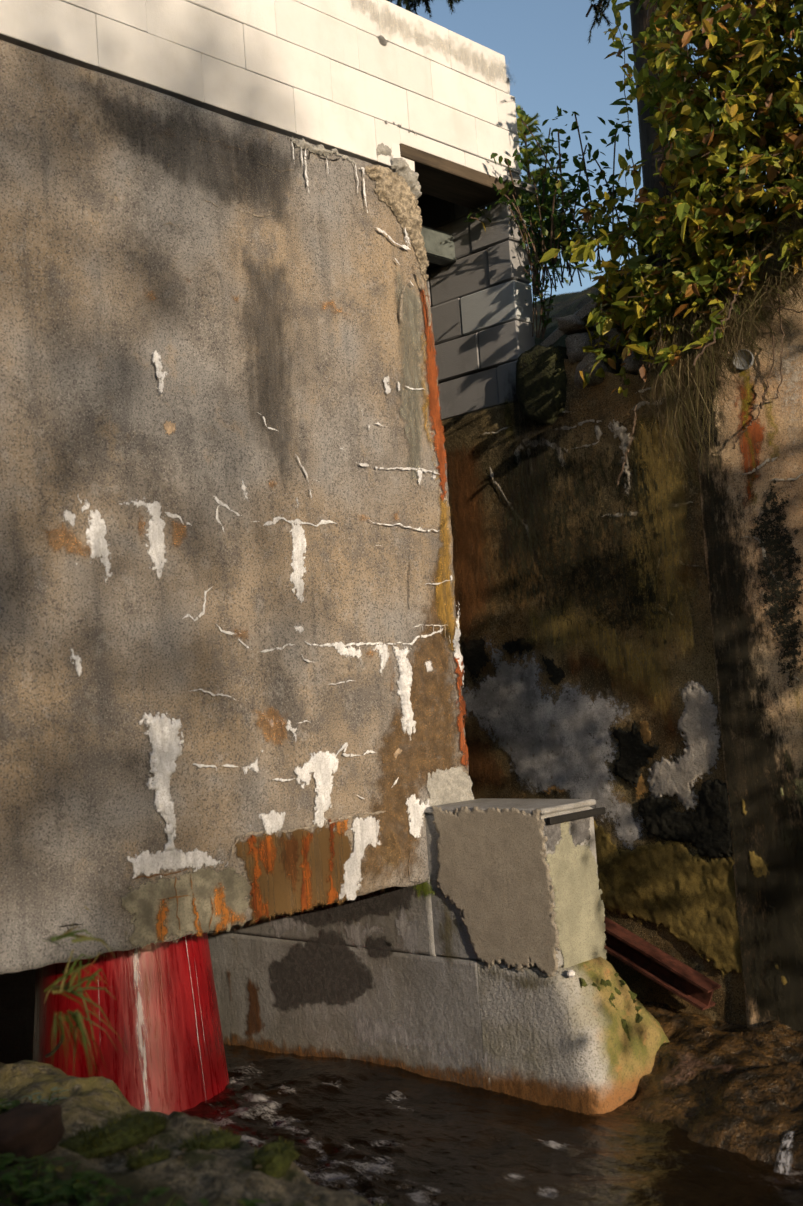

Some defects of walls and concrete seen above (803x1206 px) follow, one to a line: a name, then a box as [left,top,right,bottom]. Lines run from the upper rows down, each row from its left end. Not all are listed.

spalling [365,143,429,281]
crack [359,463,439,484]
efflorescence [608,419,635,496]
rust [736,370,765,506]
damp [503,637,566,685]
damp [259,572,492,1011]
peeling [461,642,769,977]
rust [156,900,169,942]
rust [193,811,385,936]